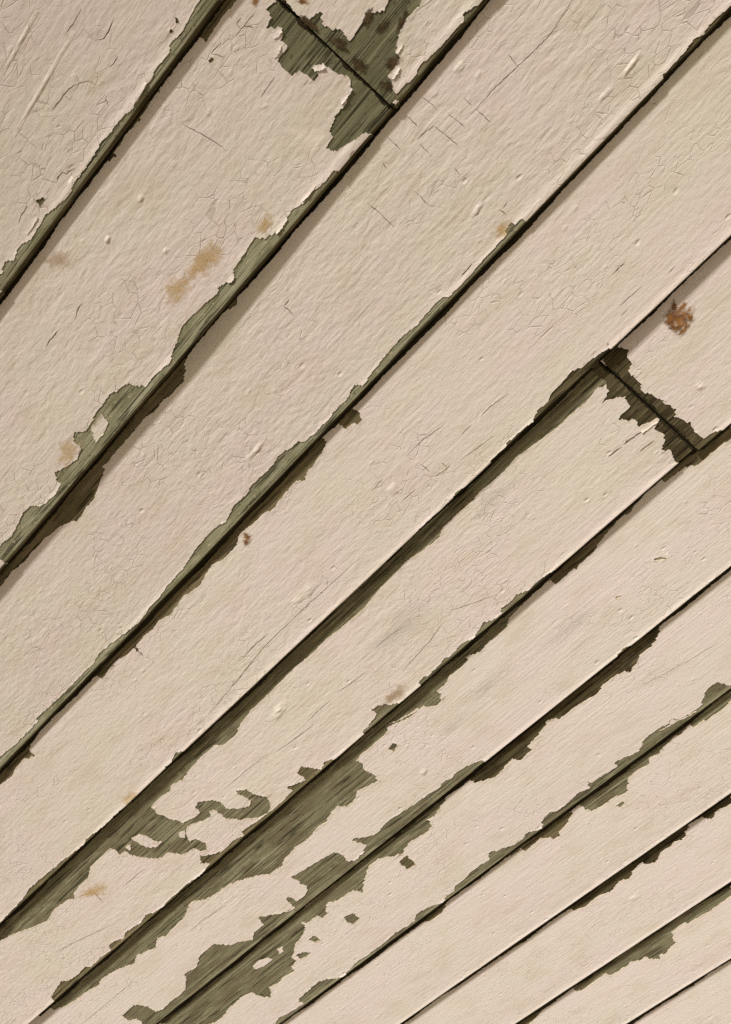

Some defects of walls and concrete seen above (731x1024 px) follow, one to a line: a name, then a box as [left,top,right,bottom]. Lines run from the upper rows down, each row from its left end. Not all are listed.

peeling [0,170,527,784]
peeling [0,346,731,1024]
peeling [266,0,488,151]
corrosion [665,300,693,335]